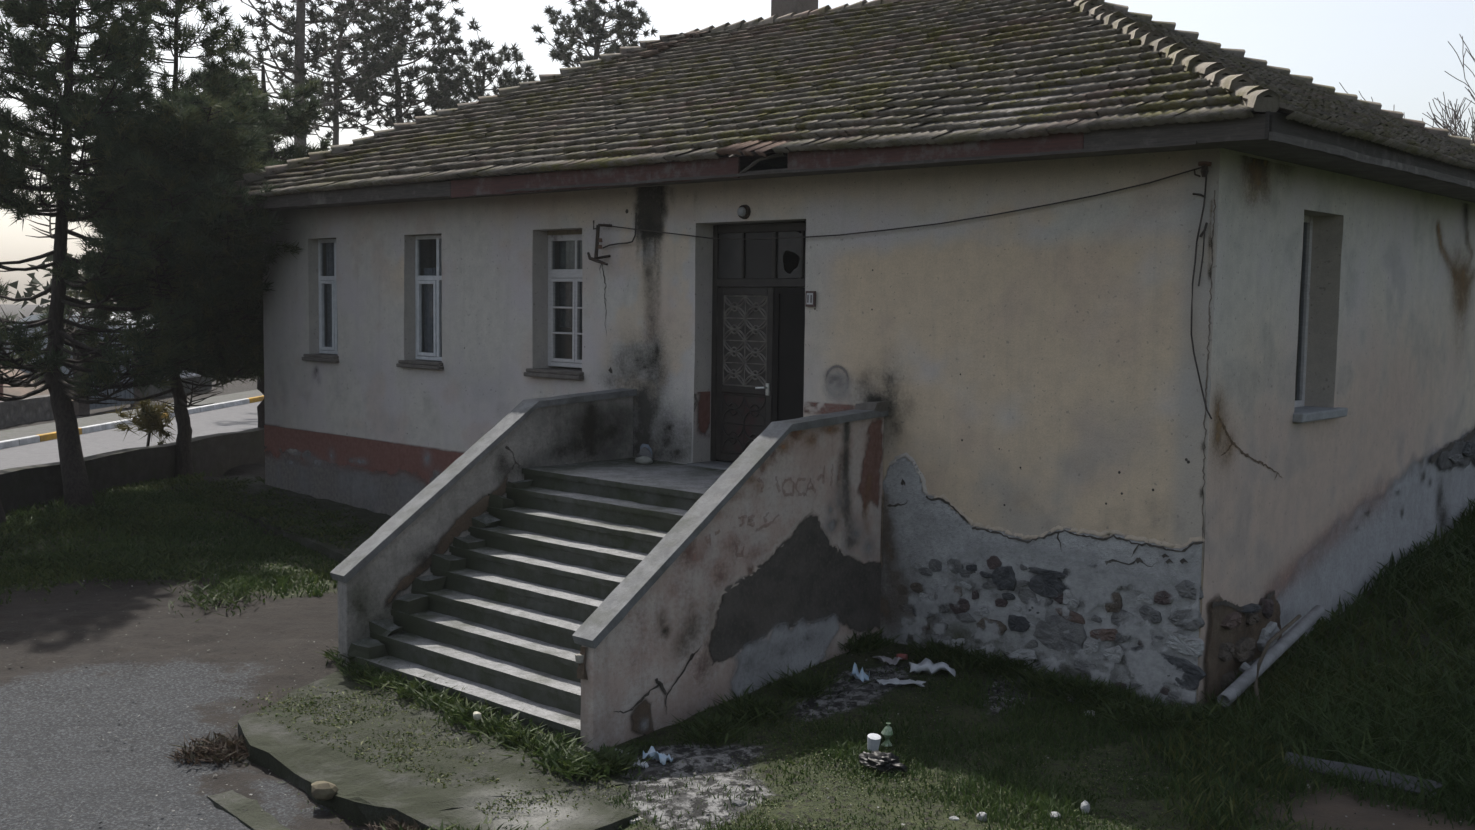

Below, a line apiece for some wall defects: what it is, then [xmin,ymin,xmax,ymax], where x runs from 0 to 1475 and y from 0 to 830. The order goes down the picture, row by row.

leakage [635,186,667,277]
leakage [558,347,685,460]
peeling [751,402,854,480]
flaking render [702,418,1475,709]
crack [614,648,700,714]